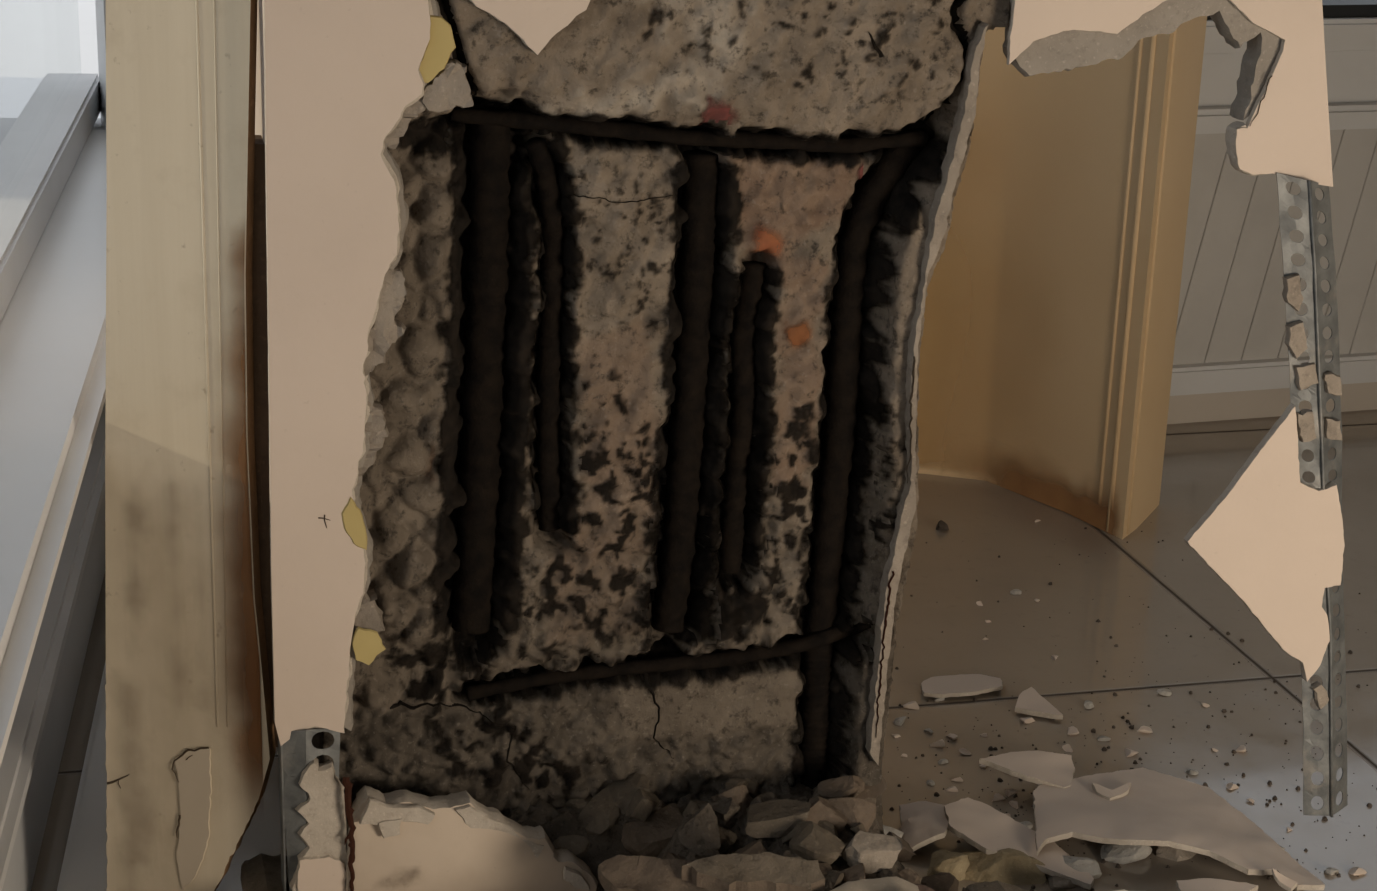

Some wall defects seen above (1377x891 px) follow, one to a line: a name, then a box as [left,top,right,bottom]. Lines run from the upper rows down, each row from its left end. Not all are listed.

spalling [311,0,1282,858]
crack [107,774,129,789]
crack [171,747,209,837]